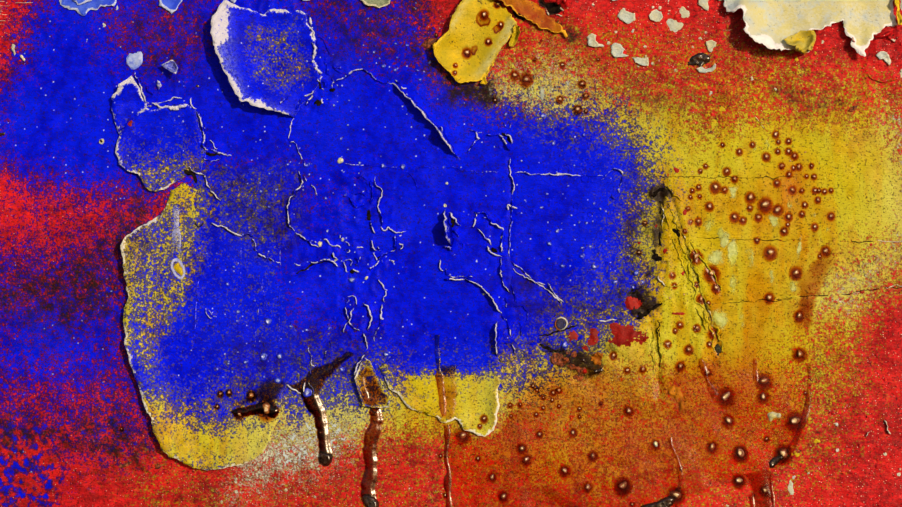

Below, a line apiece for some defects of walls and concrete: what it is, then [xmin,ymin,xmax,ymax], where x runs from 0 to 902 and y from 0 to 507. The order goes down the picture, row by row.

peeling [210,0,322,115]
peeling [433,0,568,84]
peeling [699,0,902,65]
crack [135,72,232,201]
crack [194,13,902,376]
peeling [111,76,297,471]
rust [231,353,352,467]
rust [361,380,385,507]
peeling [355,346,501,437]
rust [435,368,458,507]
rust [624,385,733,507]
rust [745,388,811,507]